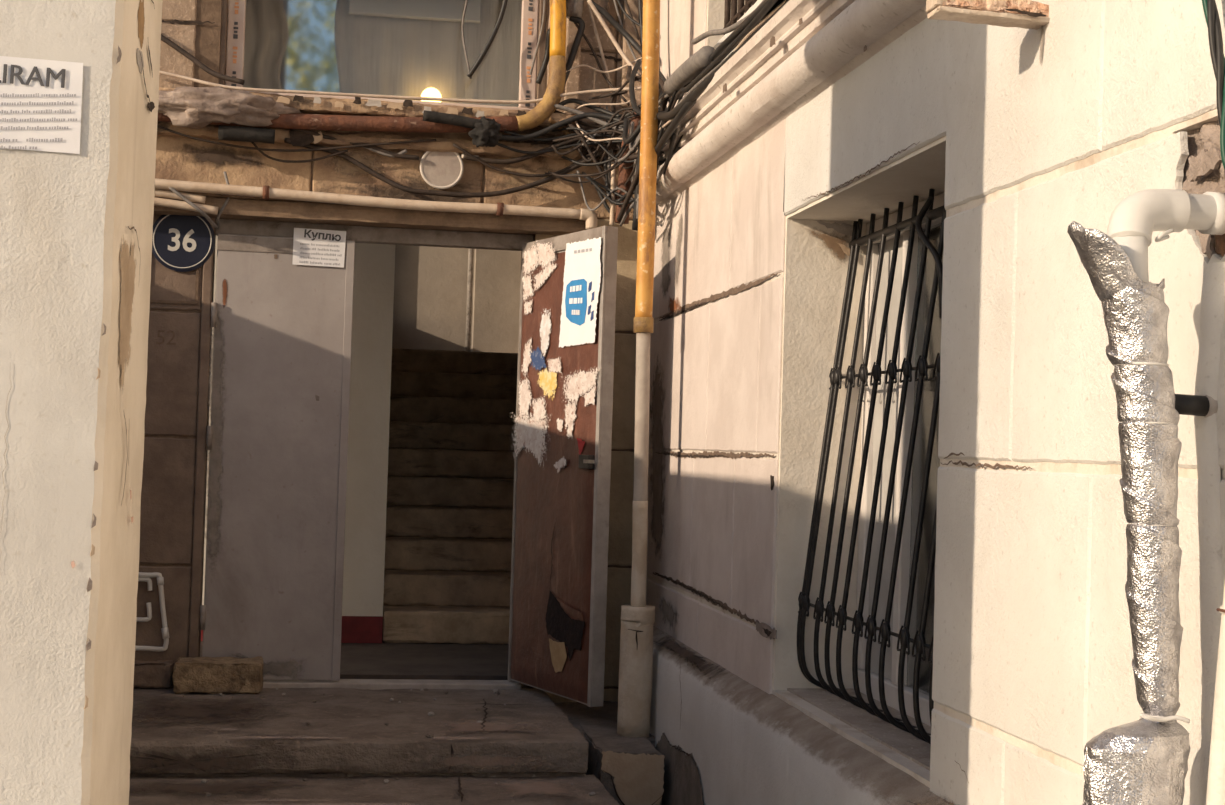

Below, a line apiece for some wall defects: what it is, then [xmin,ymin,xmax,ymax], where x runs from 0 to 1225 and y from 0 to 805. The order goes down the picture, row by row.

spalling [1182,120,1225,194]
spalling [1195,230,1225,259]
peeling [102,226,141,386]
crack [449,744,464,802]
spalling [655,733,703,805]